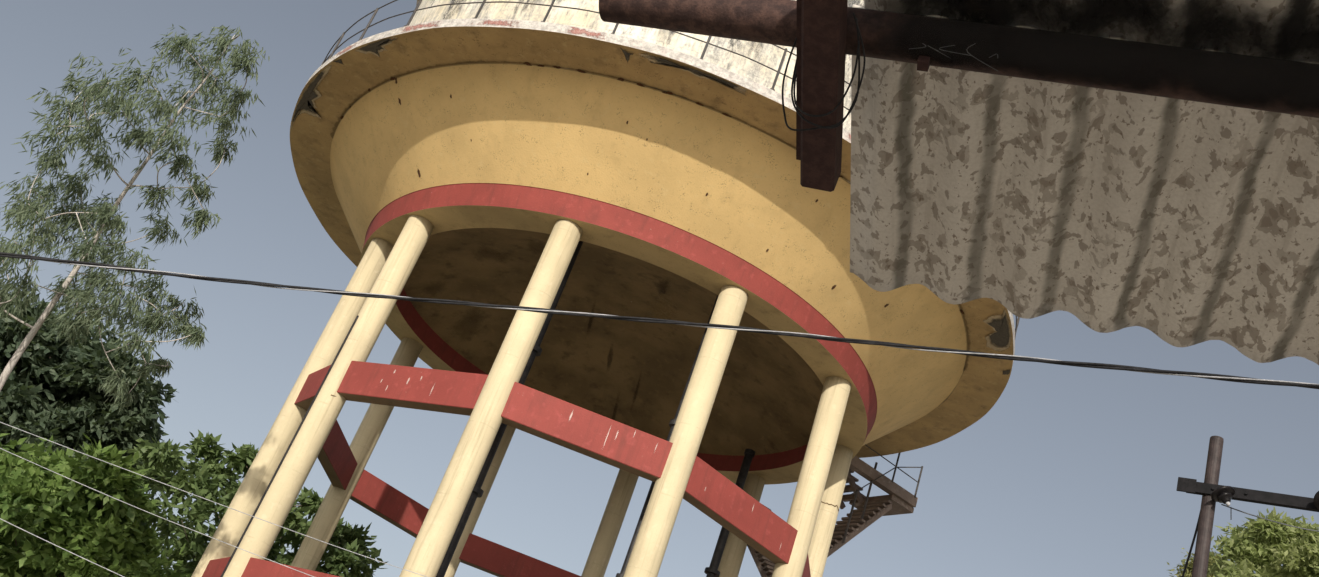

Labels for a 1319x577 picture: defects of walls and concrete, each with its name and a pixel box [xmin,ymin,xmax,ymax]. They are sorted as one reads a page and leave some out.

peeling [291,21,438,129]
peeling [983,308,1011,351]